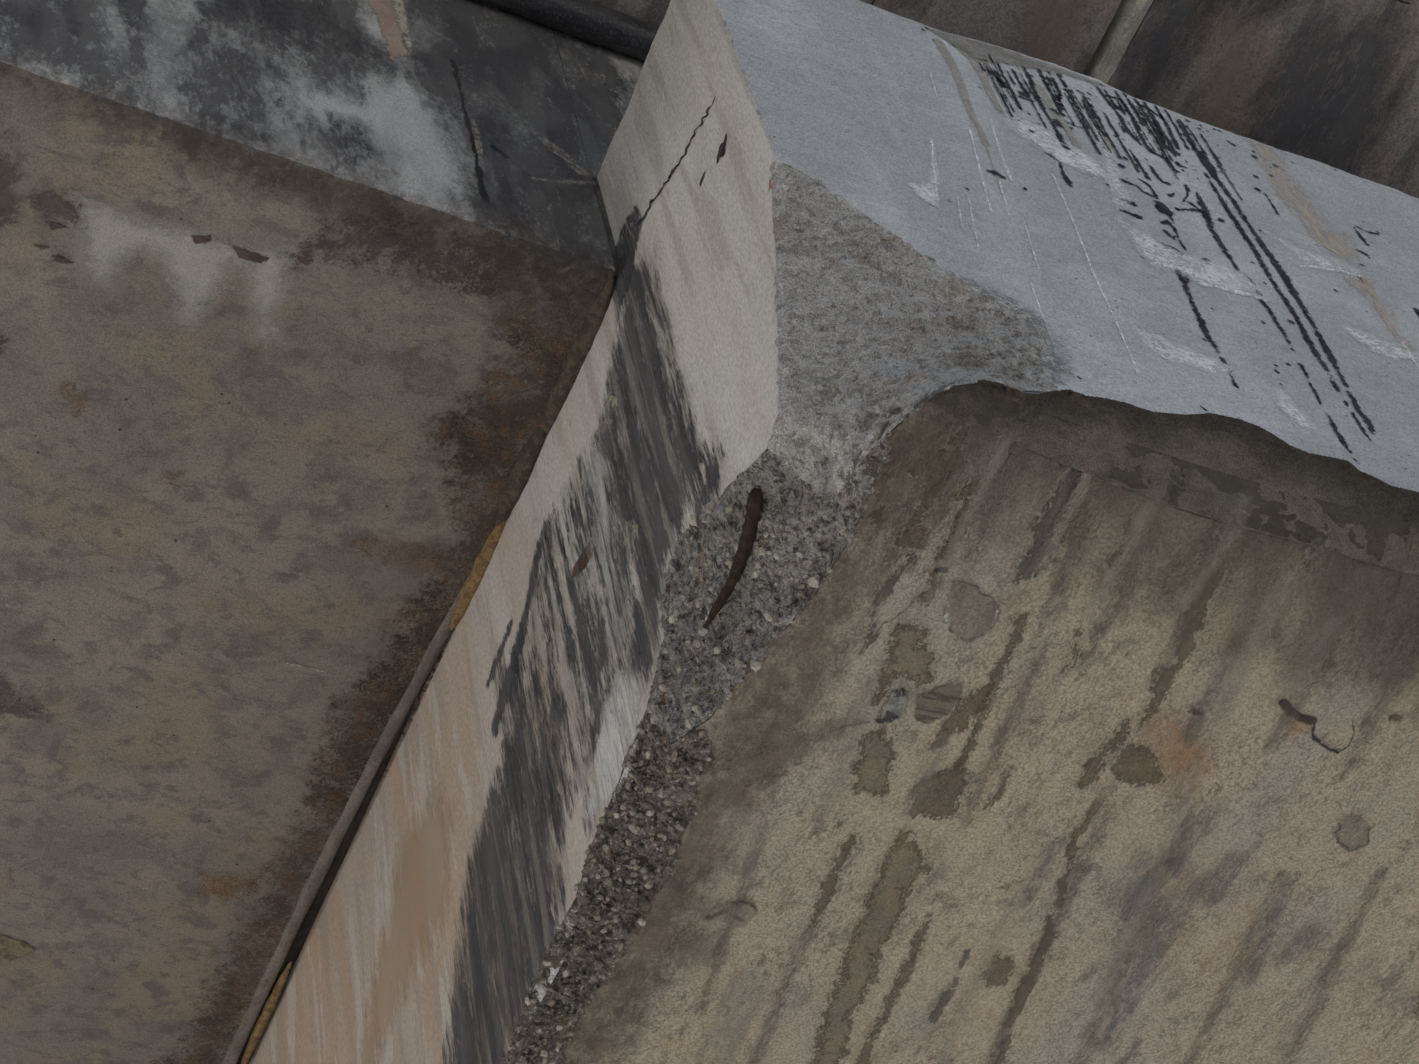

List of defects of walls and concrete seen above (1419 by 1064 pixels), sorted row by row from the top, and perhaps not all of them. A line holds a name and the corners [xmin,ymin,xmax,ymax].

damp [0,0,154,111]
damp [0,150,507,341]
crack [451,60,508,203]
crack [637,96,727,226]
damp [909,0,1403,464]
damp [175,0,725,1064]
damp [808,612,1029,1064]
damp [857,425,987,710]
spalling [501,161,1419,1064]
damp [1012,467,1087,585]
damp [928,557,1248,1064]
crack [1278,699,1355,754]